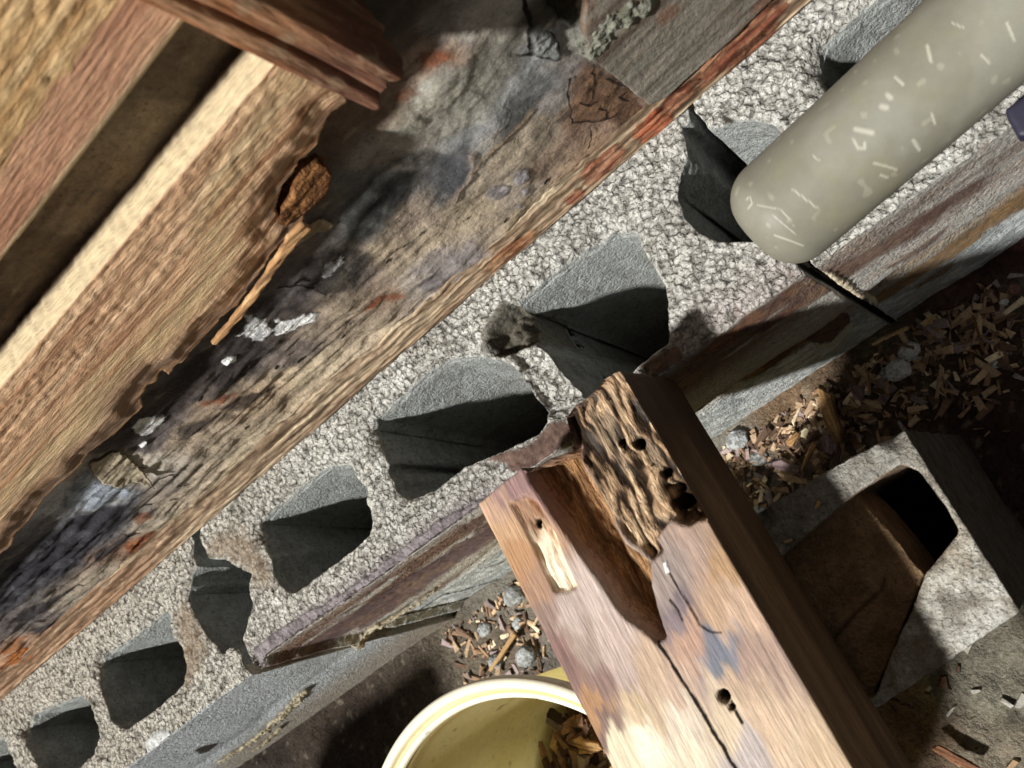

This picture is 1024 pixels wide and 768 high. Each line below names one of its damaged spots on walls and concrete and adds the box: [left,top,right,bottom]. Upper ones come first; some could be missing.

leakage [501,72,560,142]
leakage [306,148,470,294]
leakage [485,169,531,209]
corrosion [563,144,627,205]
leakage [116,296,318,448]
leakage [487,422,572,472]
leakage [0,493,142,634]
leakage [299,525,495,659]
crack [668,572,721,634]
crack [657,640,736,768]